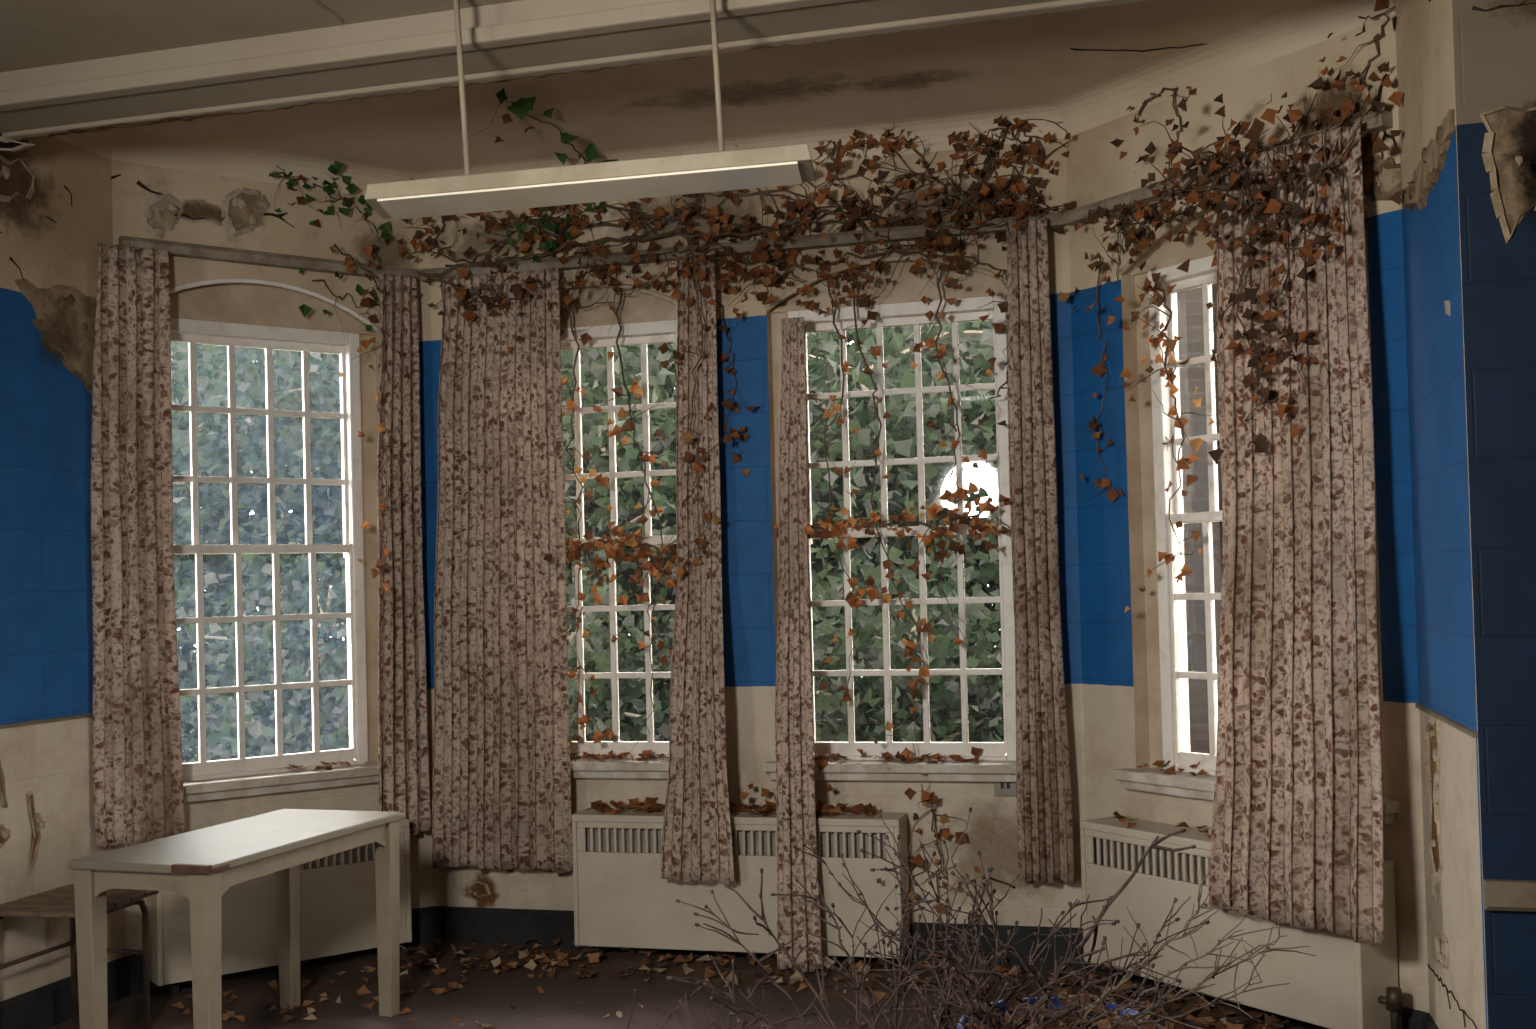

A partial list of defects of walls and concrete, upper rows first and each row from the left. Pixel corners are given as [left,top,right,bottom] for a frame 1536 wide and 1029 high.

spalling [0,133,47,228]
peeling [221,187,270,238]
peeling [1362,109,1456,215]
spalling [1480,105,1536,244]
peeling [14,278,97,395]
peeling [0,761,10,849]
peeling [26,790,45,875]